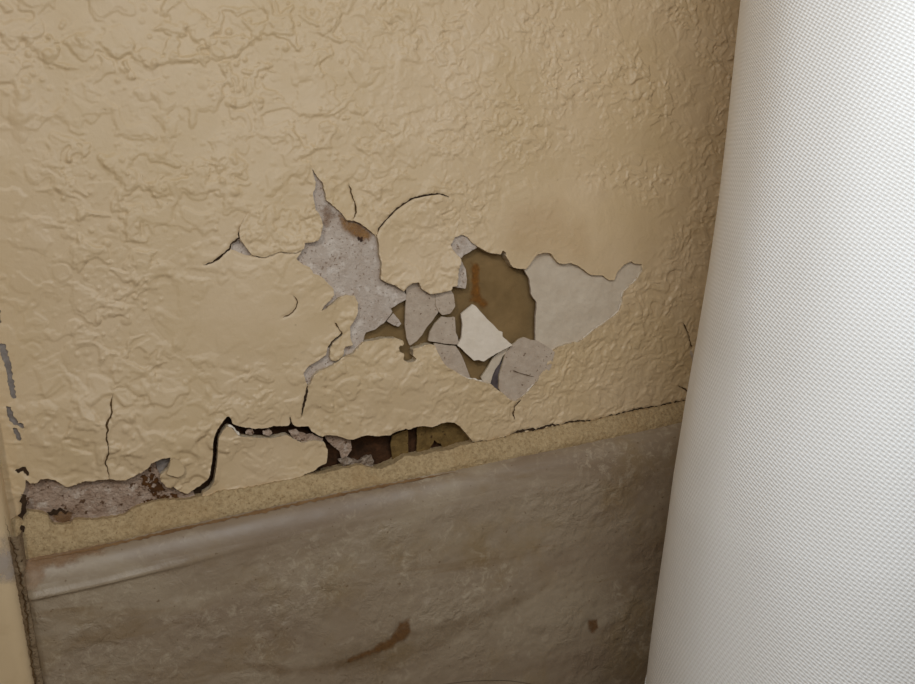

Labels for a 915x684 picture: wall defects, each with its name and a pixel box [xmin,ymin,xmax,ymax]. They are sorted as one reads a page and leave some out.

peeling [231,238,251,255]
peeling [297,170,641,401]
crack [105,395,113,474]
flaking render [23,417,469,523]